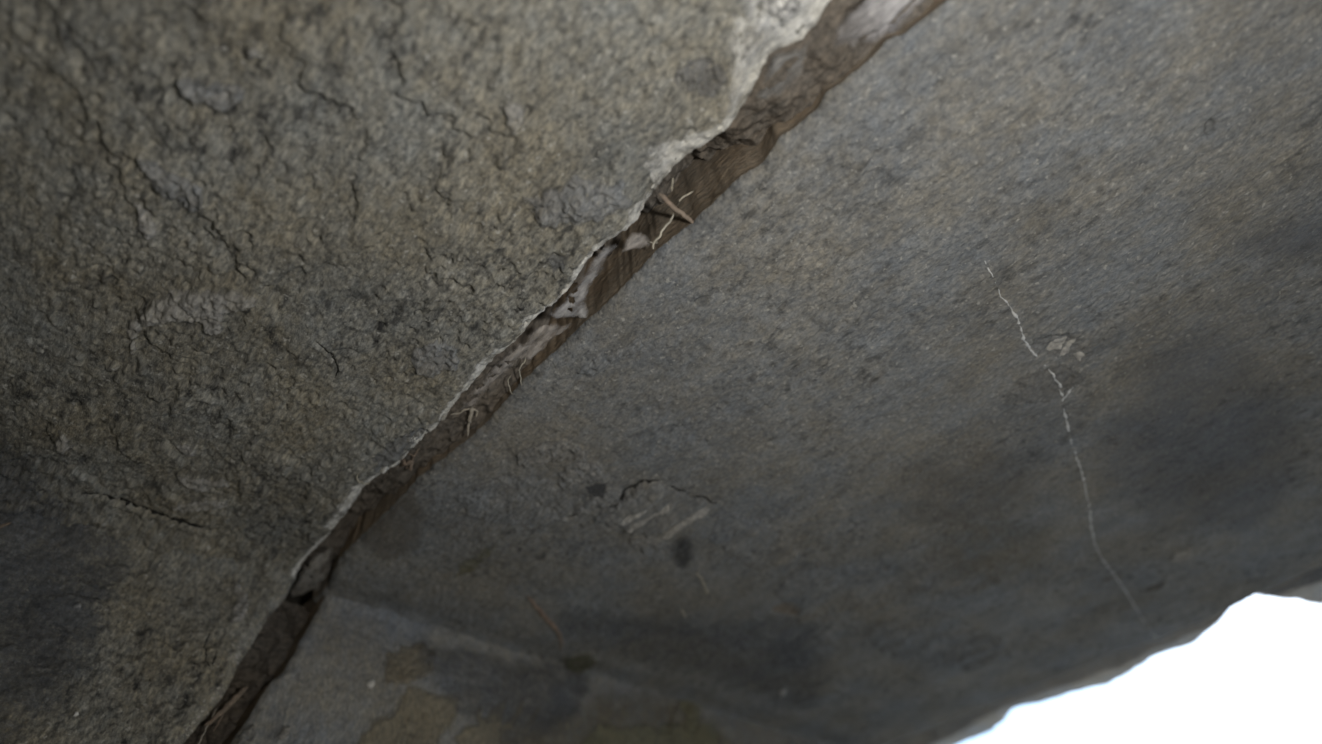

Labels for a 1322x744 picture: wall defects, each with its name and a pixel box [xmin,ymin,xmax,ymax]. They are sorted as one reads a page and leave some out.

crack [317,342,339,382]
crack [984,261,1167,651]
crack [82,492,213,530]
crack [609,479,717,507]